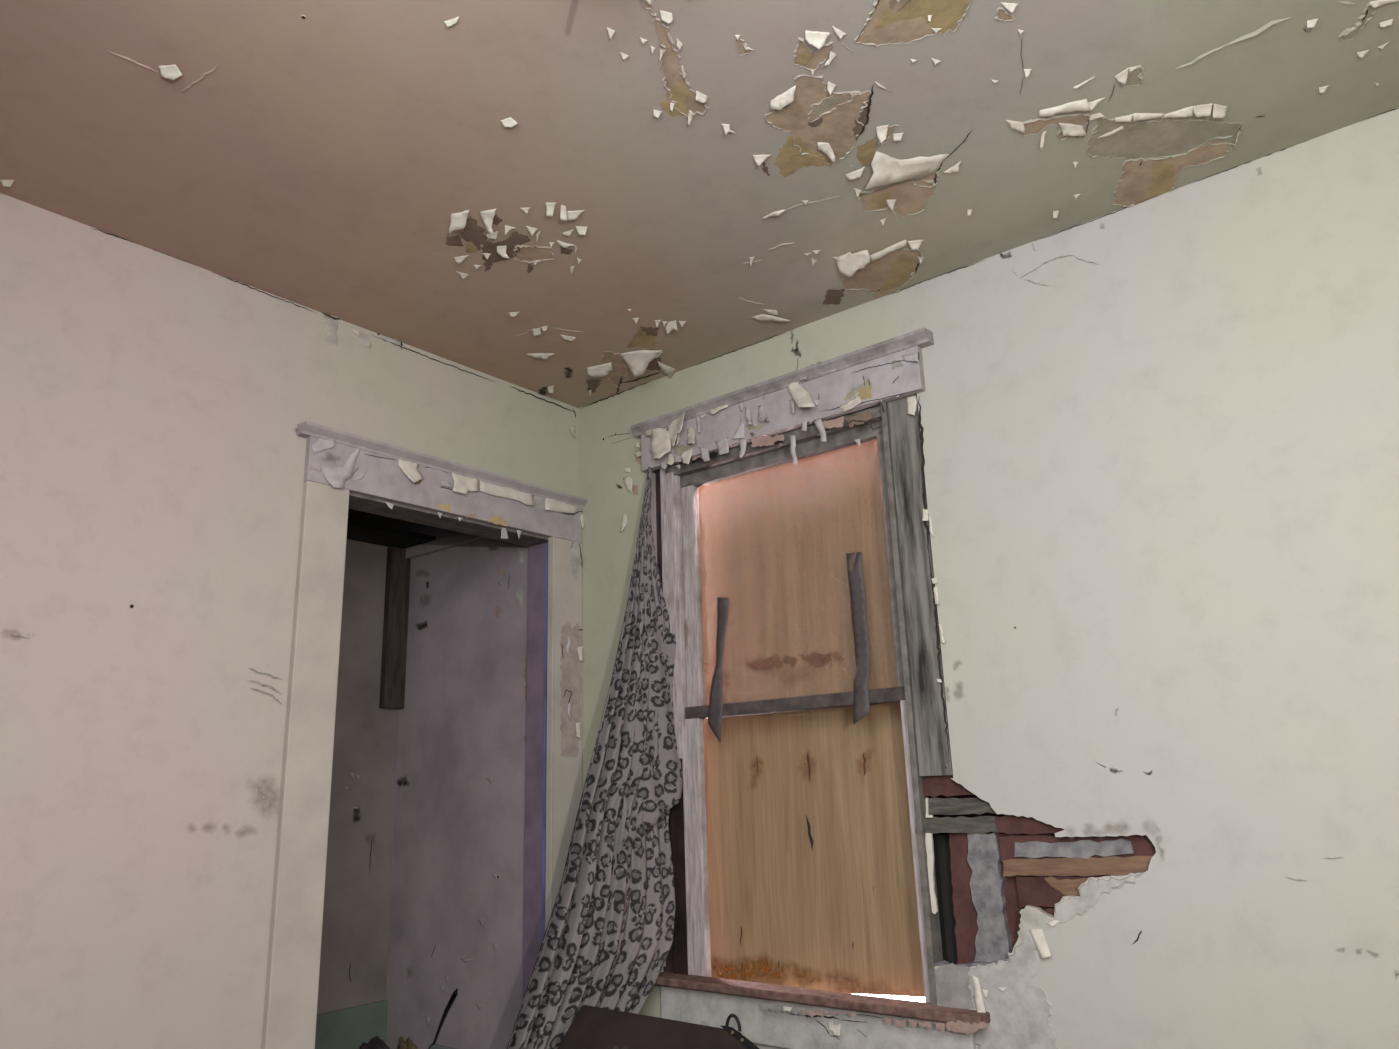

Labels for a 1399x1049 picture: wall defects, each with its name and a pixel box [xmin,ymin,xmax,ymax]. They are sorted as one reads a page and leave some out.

peeling [639,0,709,126]
peeling [735,35,755,56]
peeling [995,2,1018,22]
peeling [753,0,973,225]
peeling [1006,65,1244,208]
peeling [445,202,587,279]
peeling [805,240,925,305]
peeling [586,318,686,395]
spalling [761,775,1156,1049]